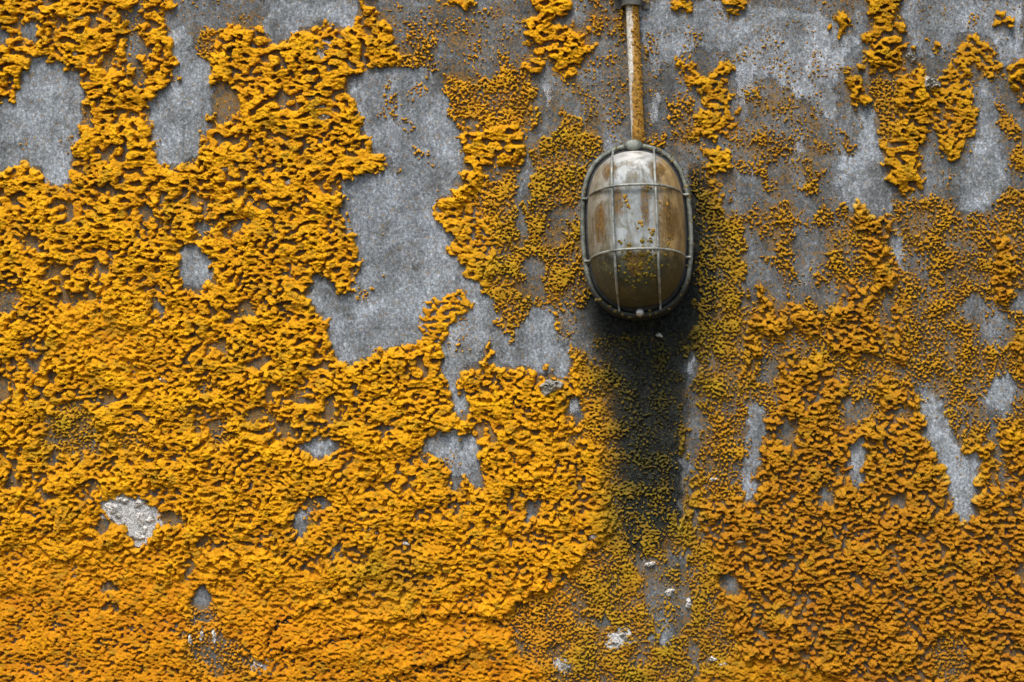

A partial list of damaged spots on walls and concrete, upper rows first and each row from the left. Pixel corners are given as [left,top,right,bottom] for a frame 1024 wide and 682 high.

water stain [582,170,716,556]